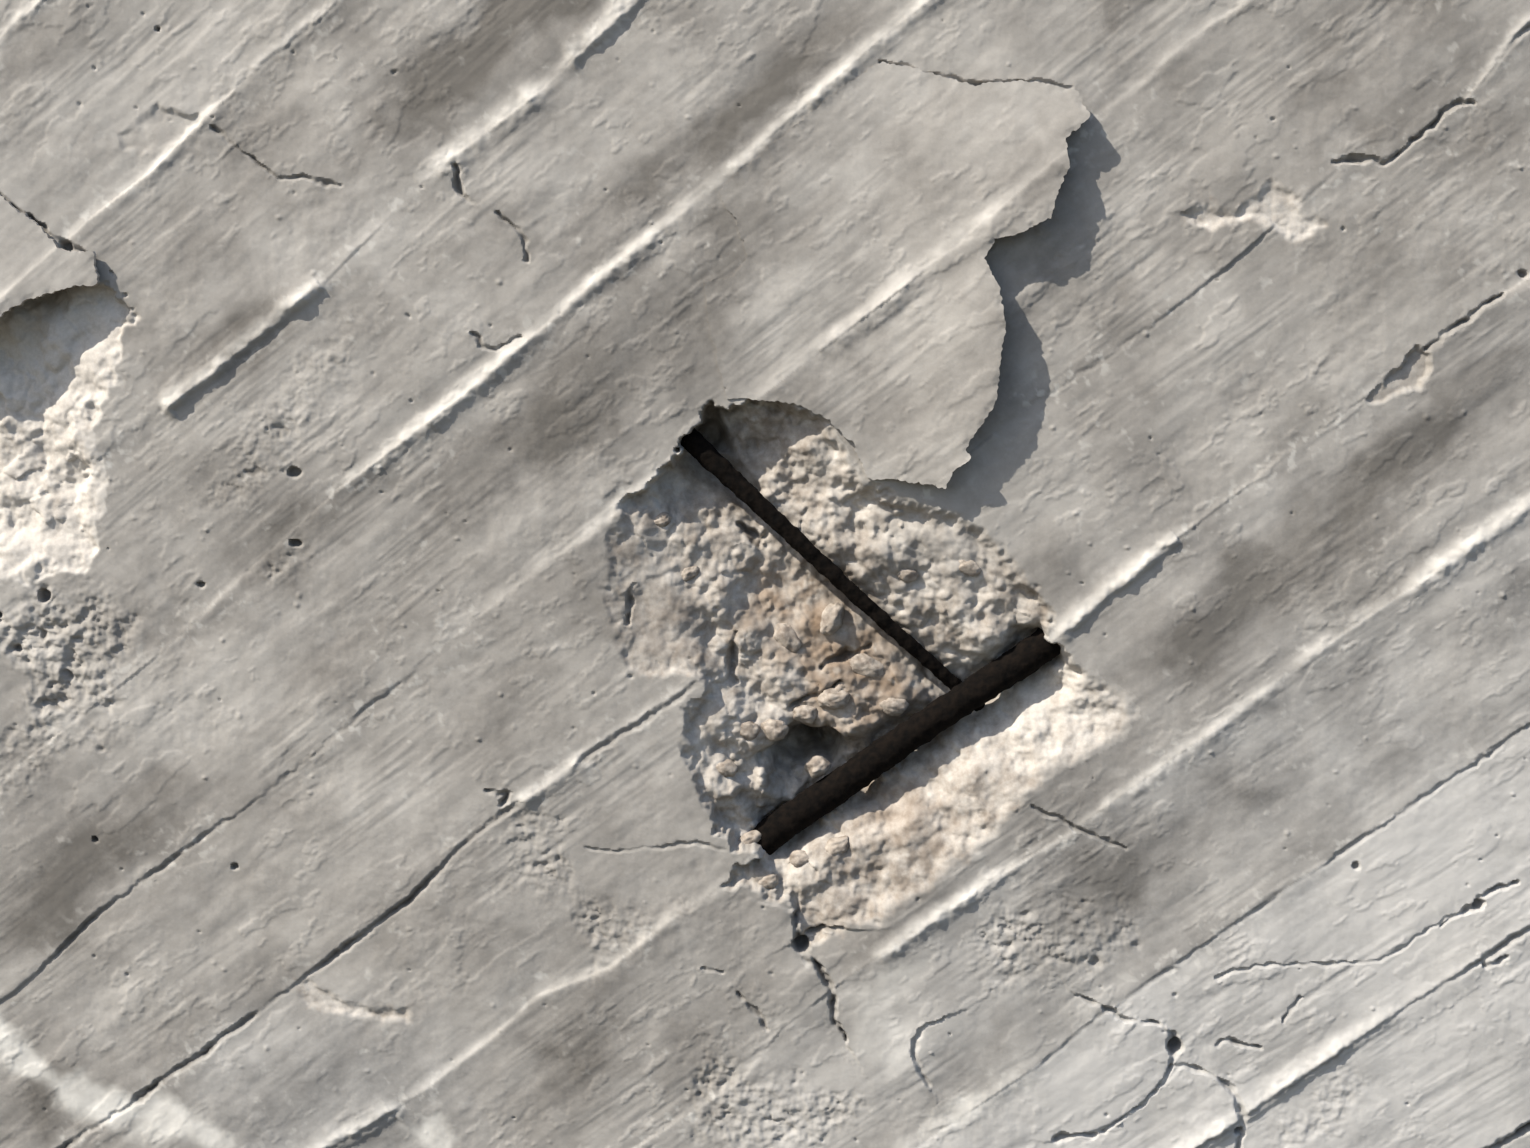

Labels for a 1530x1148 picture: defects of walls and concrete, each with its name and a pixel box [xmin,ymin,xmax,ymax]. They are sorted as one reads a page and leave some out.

crack [209,124,347,190]
crack [1330,97,1478,168]
crack [0,191,88,252]
crack [1423,292,1507,353]
spalling [0,194,143,593]
spalling [595,62,1142,949]
rust [718,538,940,759]
crack [482,788,512,809]
crack [1030,804,1129,852]
crack [791,900,849,1045]
crack [1051,878,1522,1148]
crack [910,1015,948,1090]